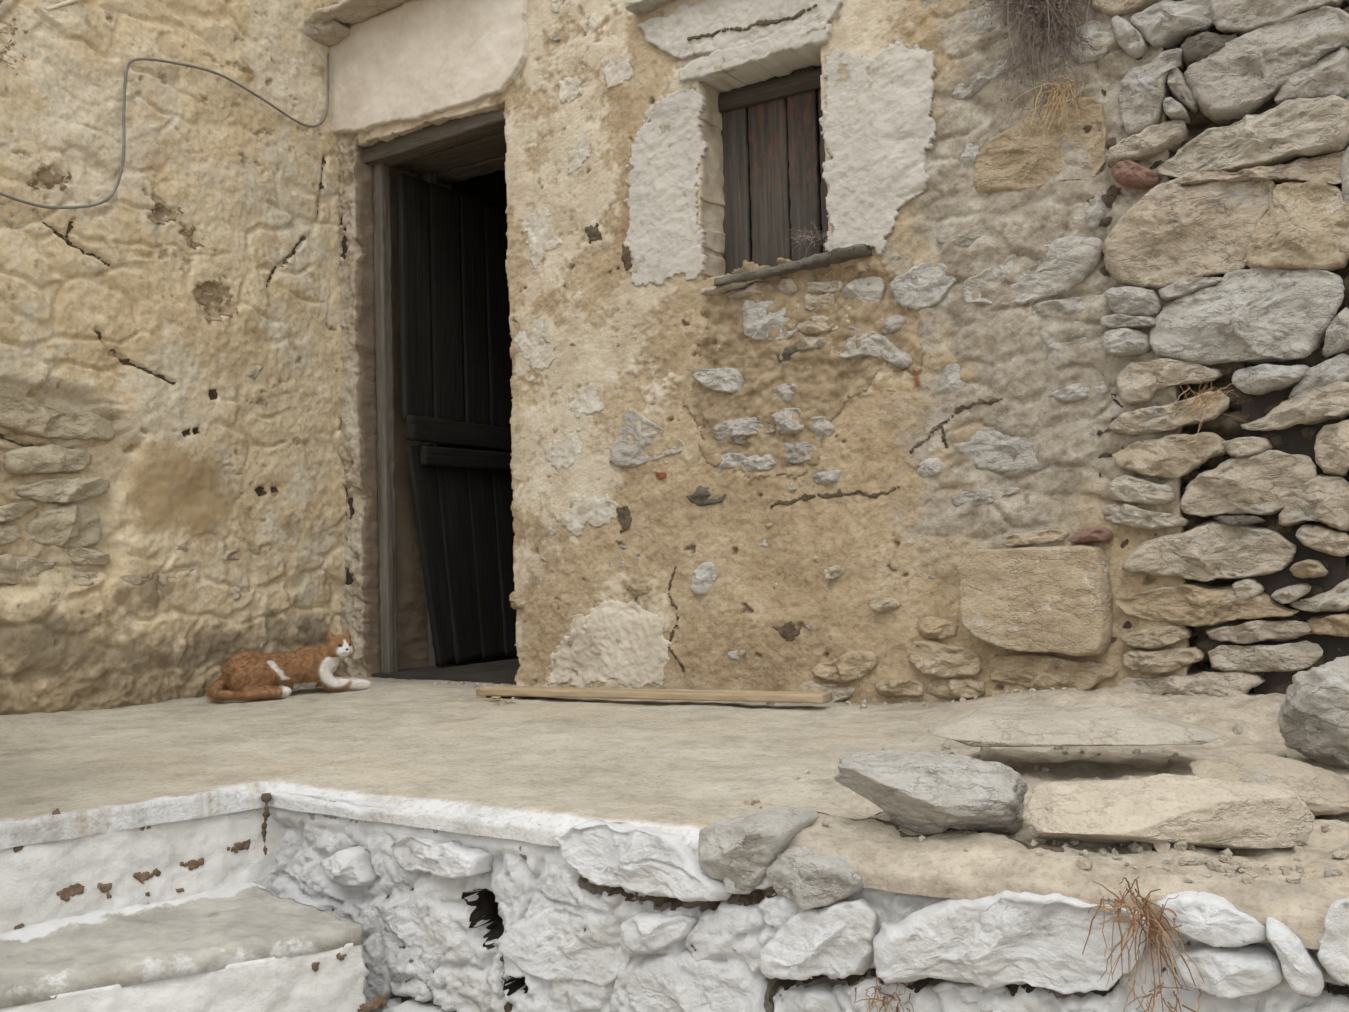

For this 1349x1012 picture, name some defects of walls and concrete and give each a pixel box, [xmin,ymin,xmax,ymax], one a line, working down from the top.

crack [266,157,326,288]
crack [42,221,110,266]
crack [95,330,175,385]
crack [0,433,39,447]
crack [668,566,685,672]
peeling [227,839,251,853]
peeling [180,858,204,870]
peeling [56,883,112,902]
peeling [133,868,161,896]
peeling [357,995,387,1012]